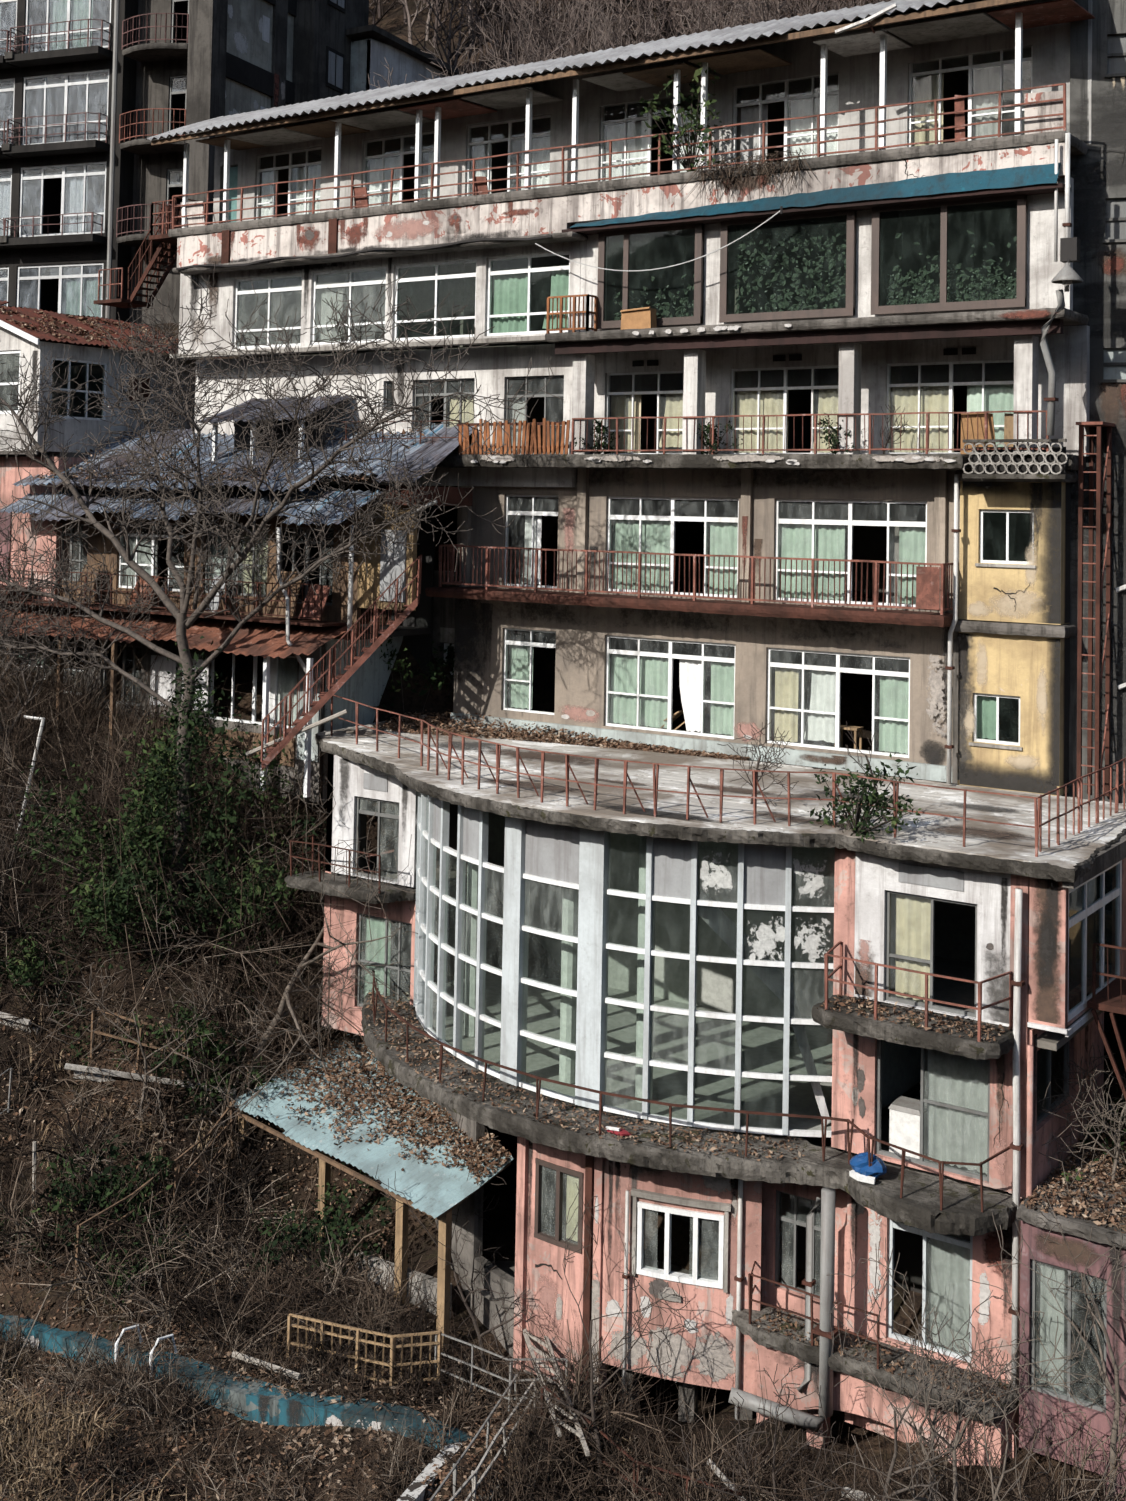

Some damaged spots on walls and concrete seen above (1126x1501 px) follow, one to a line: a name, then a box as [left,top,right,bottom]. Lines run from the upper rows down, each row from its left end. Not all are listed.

damp [1070,77,1126,338]
peeling [377,218,439,241]
crack [993,582,1031,610]
peeling [615,1161,661,1191]
peeling [590,1175,738,1406]